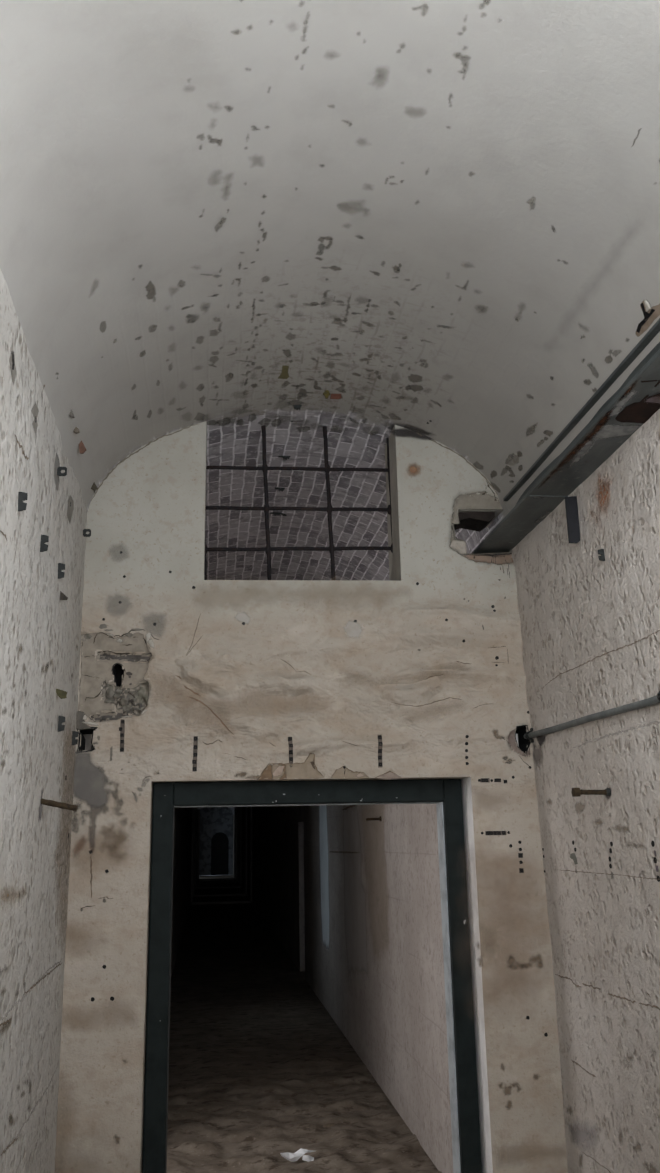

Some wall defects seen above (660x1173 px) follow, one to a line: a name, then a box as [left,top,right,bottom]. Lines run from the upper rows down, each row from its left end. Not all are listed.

spalling [582,300,660,392]
rust [539,380,660,488]
peeling [572,391,660,463]
spalling [450,451,523,565]
spalling [72,624,159,753]
crack [541,630,660,689]
peeling [101,747,158,823]
peeling [236,753,401,780]
crack [0,962,63,1026]
crack [555,974,660,1010]